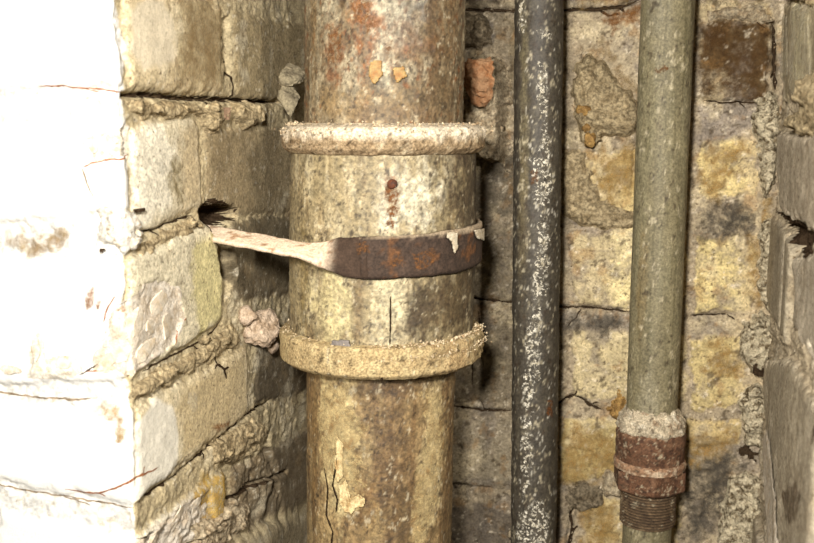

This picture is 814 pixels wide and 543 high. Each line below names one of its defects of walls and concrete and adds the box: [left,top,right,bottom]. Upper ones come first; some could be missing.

crack [45,36,270,105]